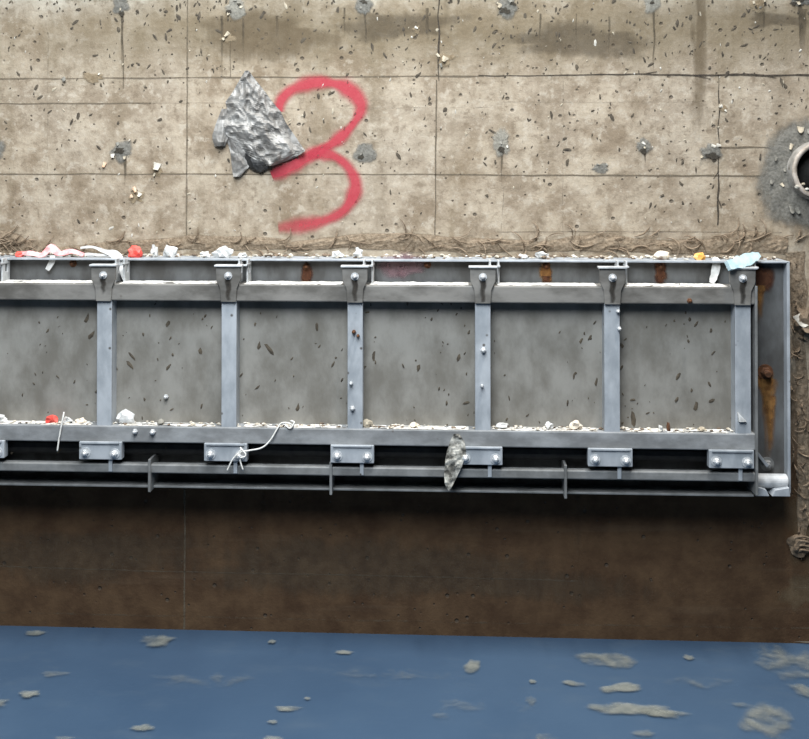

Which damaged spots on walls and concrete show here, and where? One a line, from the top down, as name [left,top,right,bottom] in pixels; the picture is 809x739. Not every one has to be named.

corrosion [540,257,552,283]
corrosion [654,258,667,283]
corrosion [758,375,776,437]